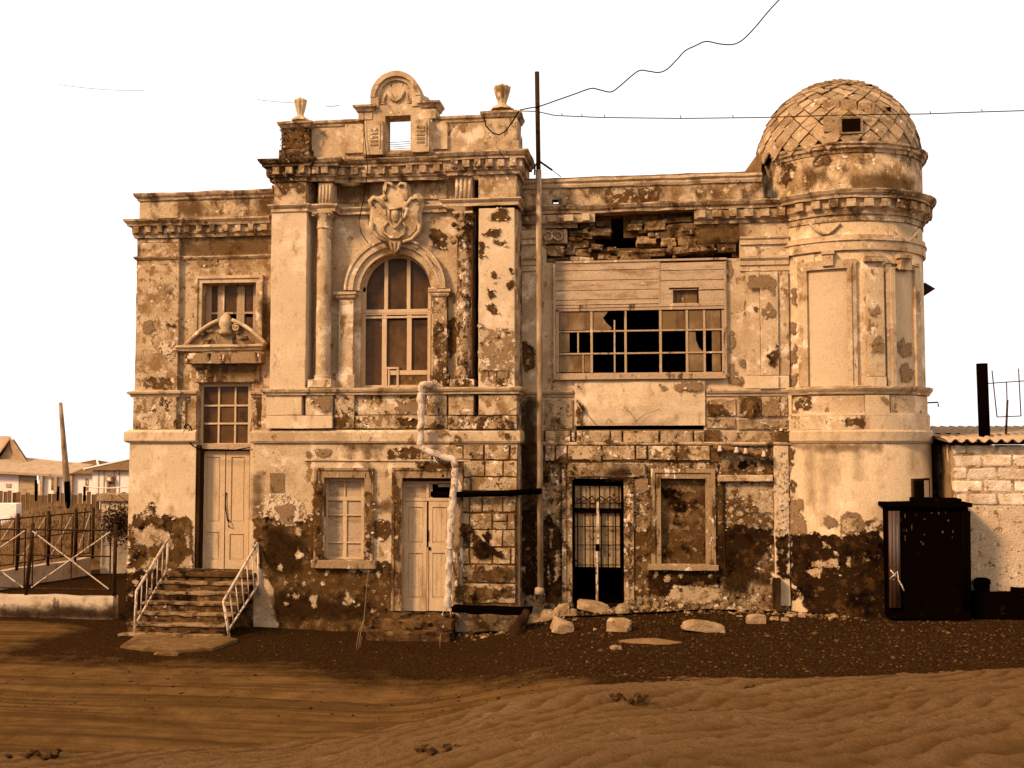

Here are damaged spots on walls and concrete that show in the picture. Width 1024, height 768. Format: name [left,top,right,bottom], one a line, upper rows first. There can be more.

peeling [478,207,511,259]
peeling [485,268,516,315]
peeling [746,274,777,319]
peeling [141,320,176,361]
peeling [477,323,518,387]
peeling [142,376,172,390]
peeling [724,428,807,537]
leakage [250,475,399,632]
spalling [628,528,651,596]
leakage [646,484,888,618]
peeling [668,584,723,605]